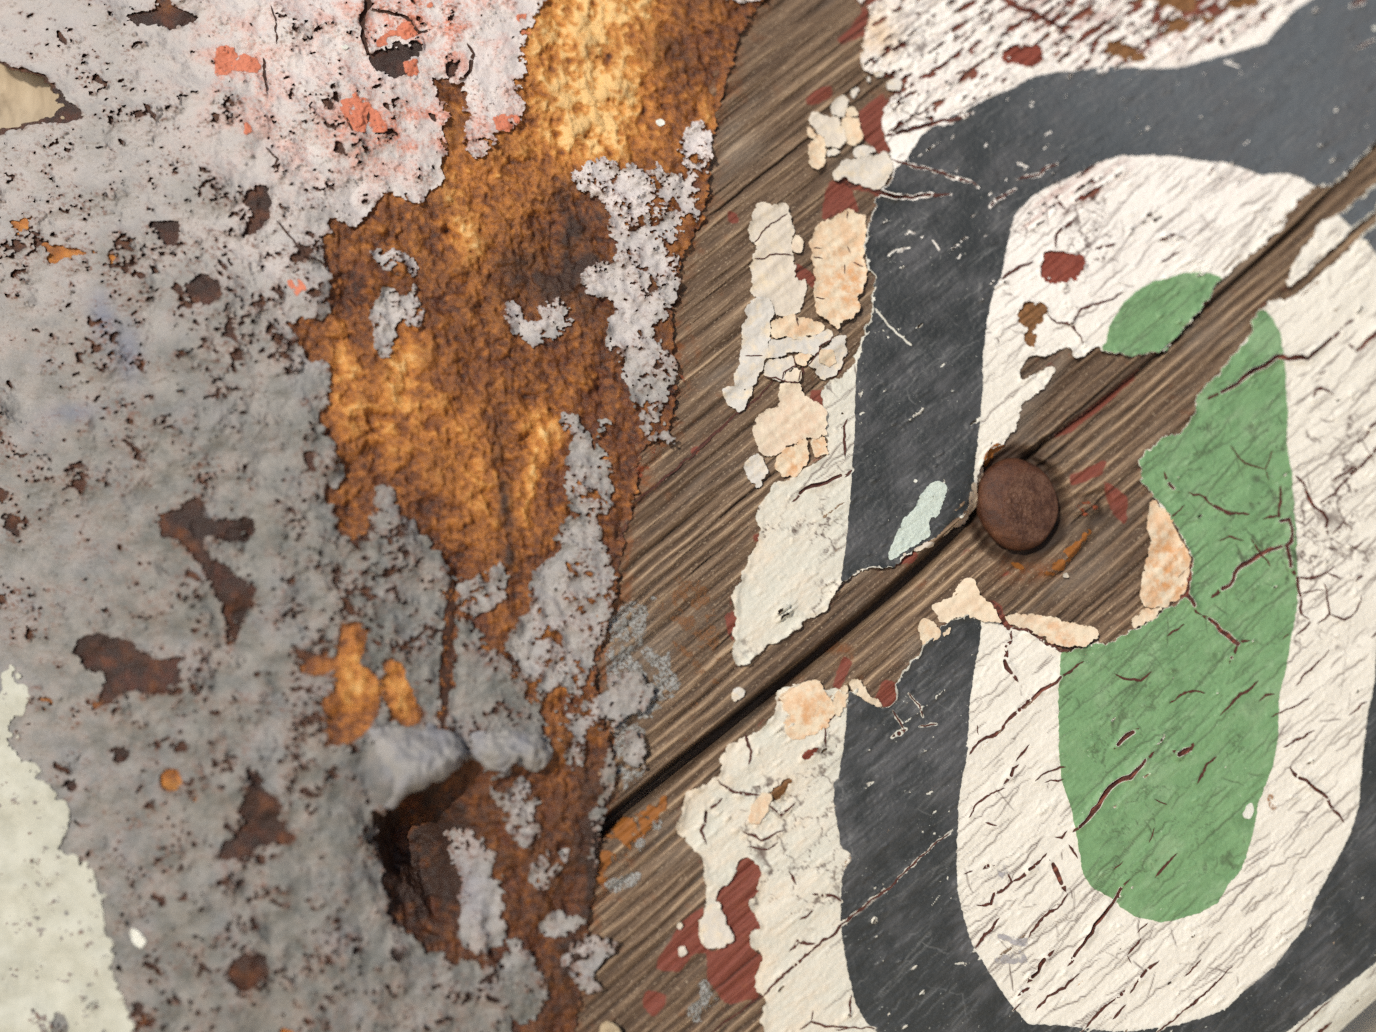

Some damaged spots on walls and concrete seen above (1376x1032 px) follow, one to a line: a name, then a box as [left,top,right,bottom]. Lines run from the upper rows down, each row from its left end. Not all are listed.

peeling [1001,43,1044,67]
peeling [807,70,902,190]
peeling [722,202,868,488]
rust [287,0,763,1032]
rust [984,443,1004,467]
peeling [918,578,1099,647]
rust [1045,501,1098,576]
peeling [1131,500,1191,629]
crack [1164,422,1376,822]
crack [699,600,1084,1032]
crack [965,728,1217,1011]
crack [1081,923,1233,1032]